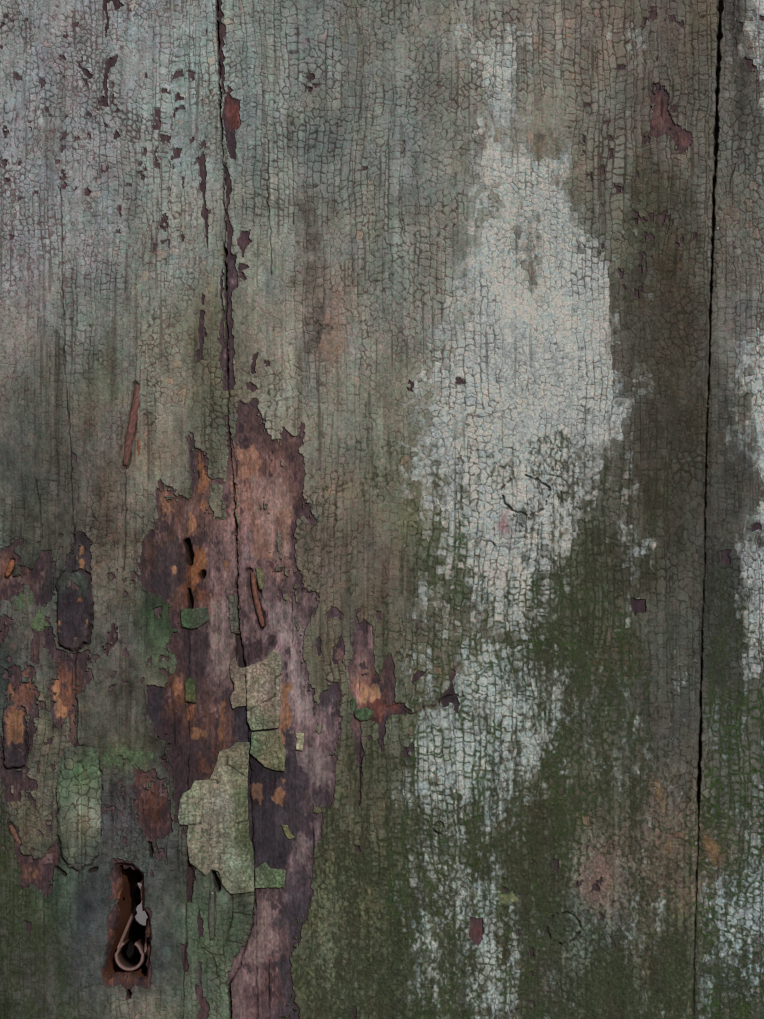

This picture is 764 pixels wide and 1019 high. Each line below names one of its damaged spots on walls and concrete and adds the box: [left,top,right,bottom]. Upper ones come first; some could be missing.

peeling [642,83,693,153]
peeling [0,0,412,1019]
leakage [393,23,659,1019]
peeling [441,670,465,714]
leakage [652,897,667,943]
leakage [697,824,764,1018]